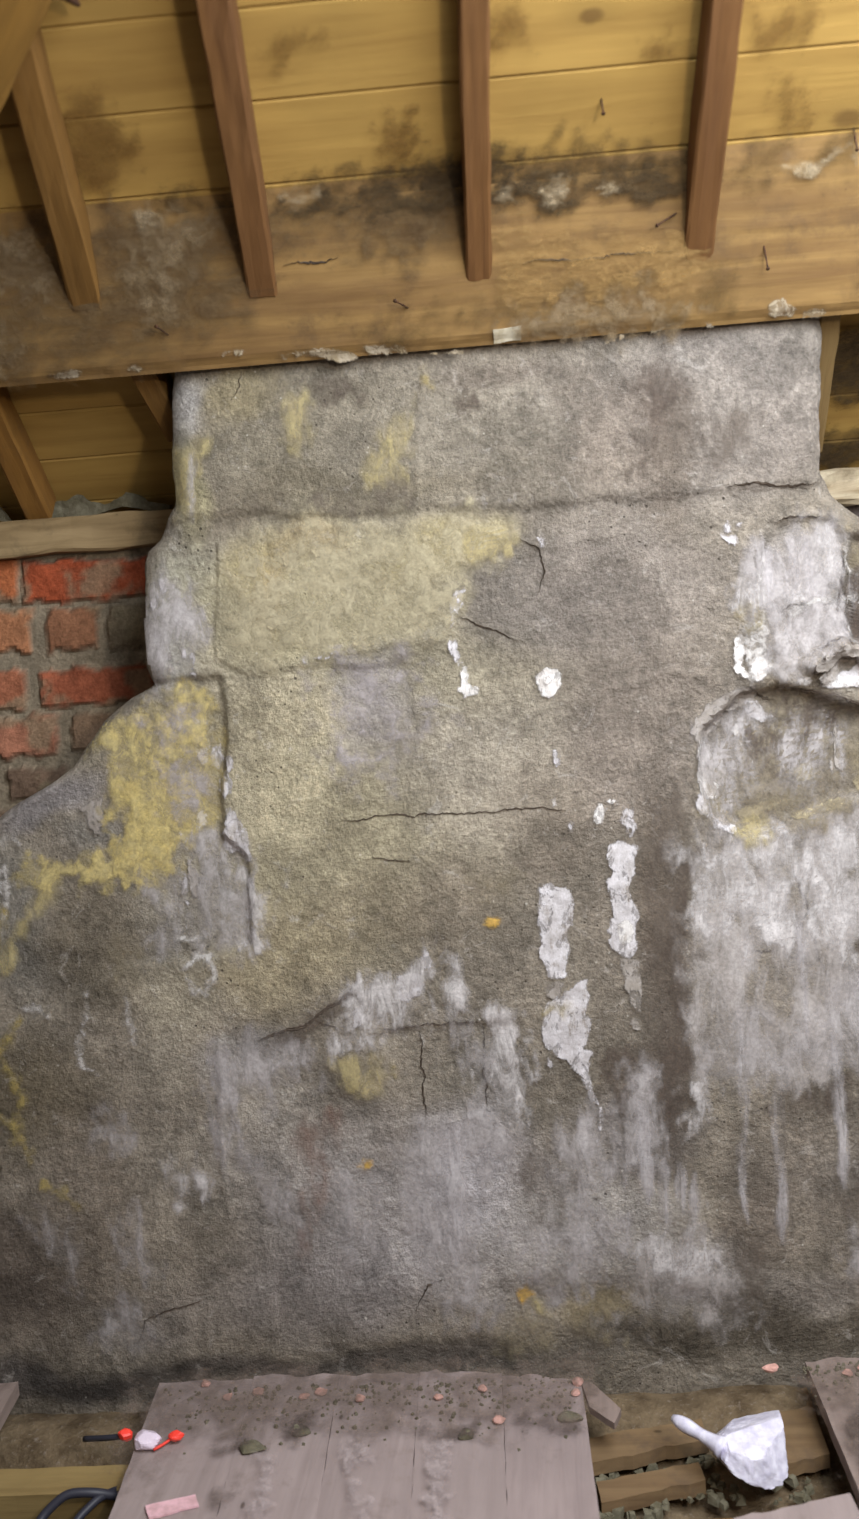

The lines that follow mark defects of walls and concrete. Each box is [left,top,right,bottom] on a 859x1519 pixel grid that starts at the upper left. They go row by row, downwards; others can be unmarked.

water stain [276,109,463,218]
water stain [491,139,687,215]
crack [522,540,545,594]
peeling [535,667,562,698]
flaking render [690,599,859,834]
crack [348,806,566,822]
flaking render [144,743,269,995]
peeling [594,799,642,1030]
crack [258,982,357,1041]
crack [386,1020,488,1117]
water stain [523,802,859,1325]
water stain [402,1105,514,1314]